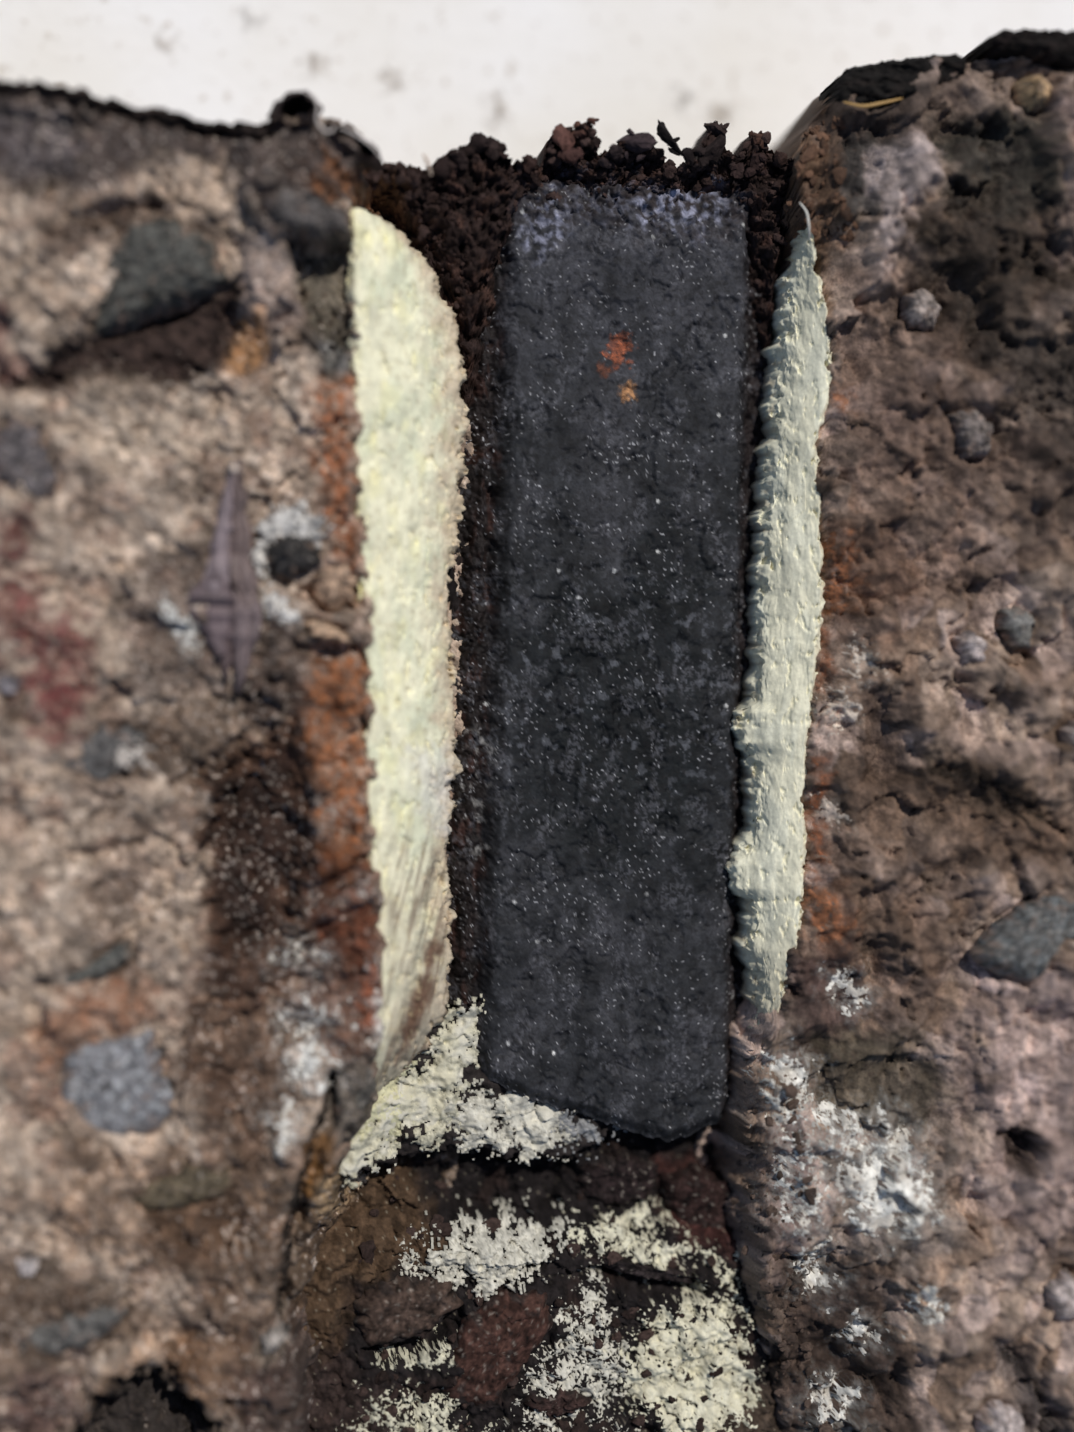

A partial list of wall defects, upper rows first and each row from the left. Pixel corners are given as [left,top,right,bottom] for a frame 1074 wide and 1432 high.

rust [310,120,794,408]
rust [312,376,367,594]
rust [303,655,379,1026]
efflorescence [818,961,872,1019]
crack [277,1074,339,1317]
efflorescence [741,1038,945,1295]
efflorescence [793,1370,861,1427]
efflorescence [831,1308,906,1356]
efflorescence [904,1285,950,1326]